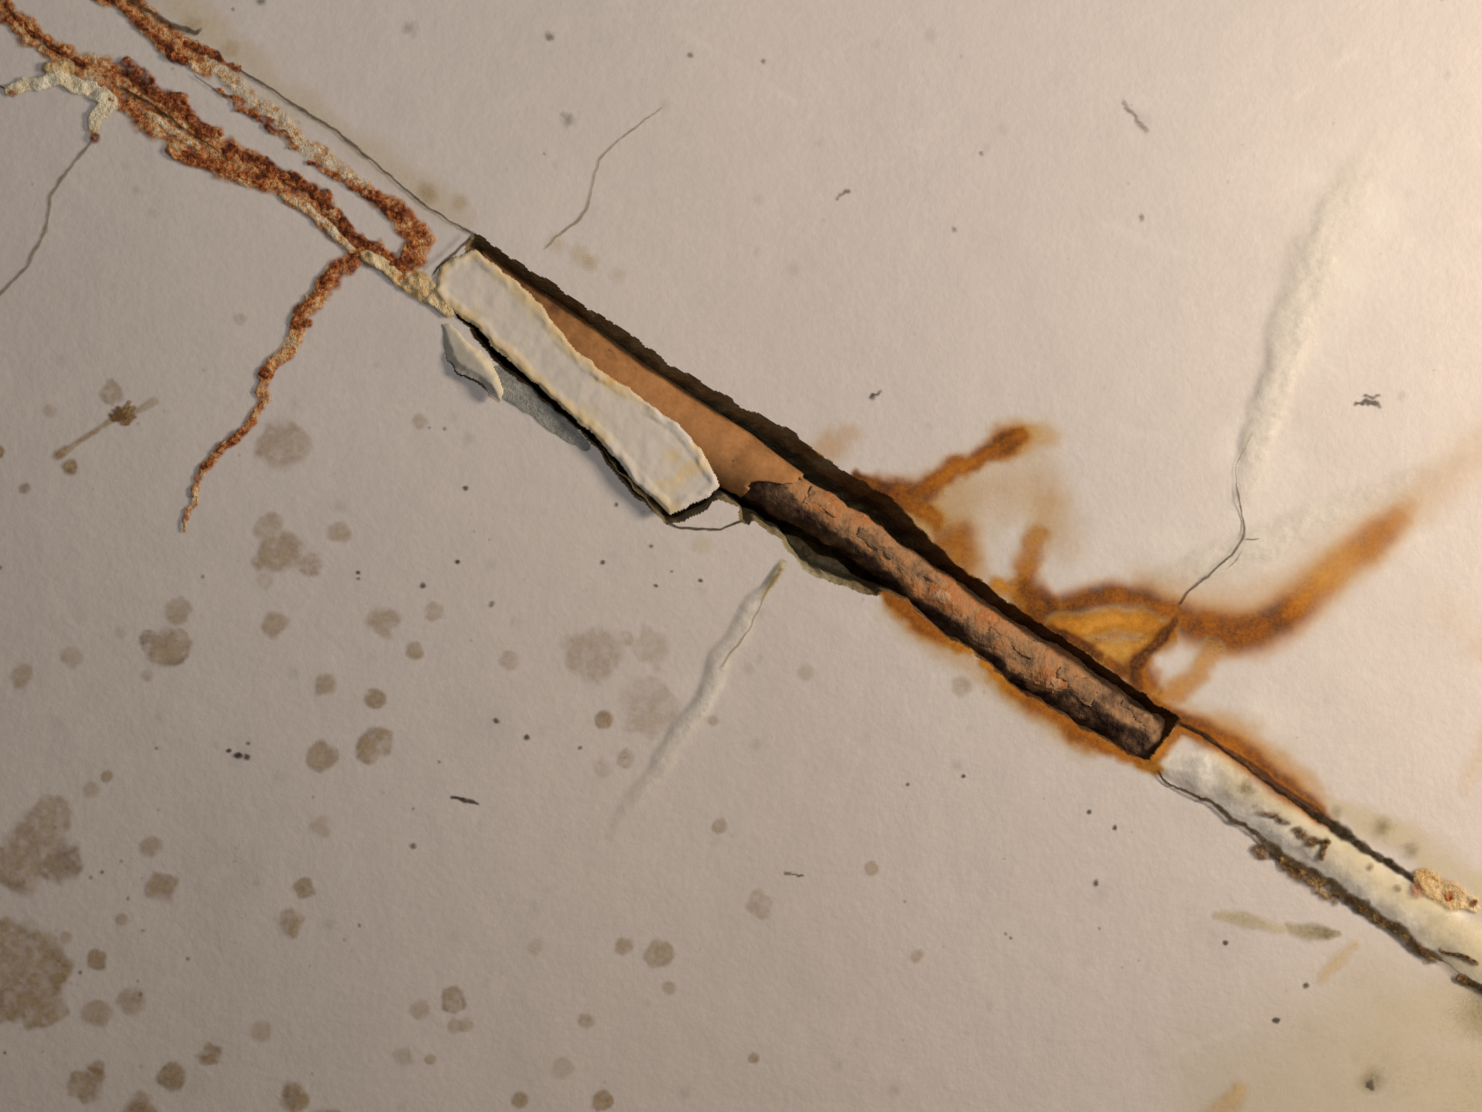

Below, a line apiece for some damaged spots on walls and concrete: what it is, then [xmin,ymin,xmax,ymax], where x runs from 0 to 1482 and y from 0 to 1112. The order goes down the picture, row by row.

crack [0,0,473,532]
rust [56,399,156,473]
spalling [434,233,1181,760]
rust [852,424,1044,589]
rust [880,516,1400,828]
crack [1179,486,1256,604]
damp [0,918,70,1027]
crack [1157,724,1482,992]